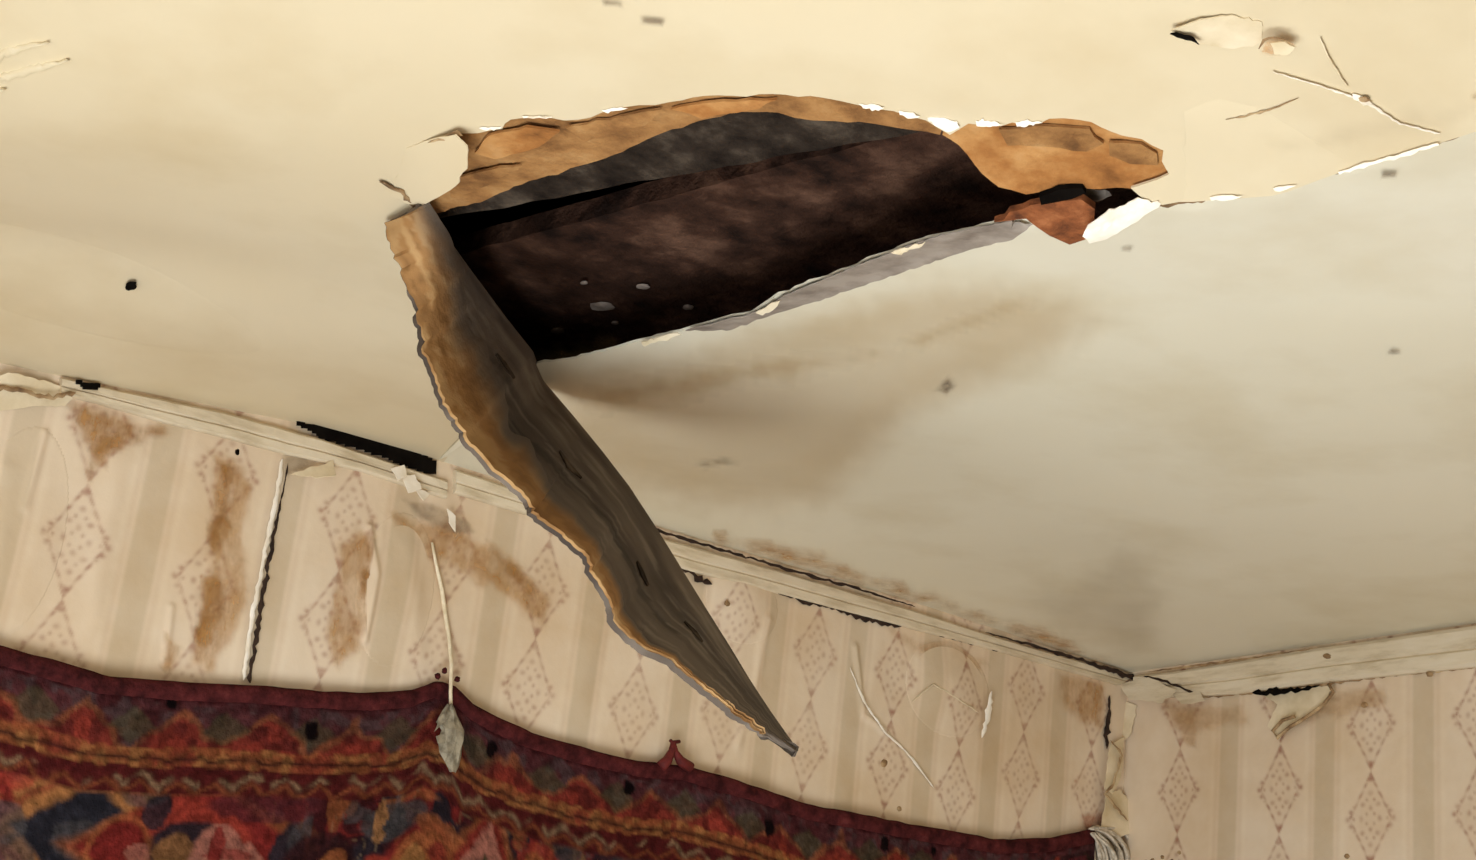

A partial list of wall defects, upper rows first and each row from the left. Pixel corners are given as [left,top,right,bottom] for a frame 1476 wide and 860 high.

peeling [1170,14,1295,55]
crack [1274,38,1456,174]
spalling [429,94,1168,347]
crack [1160,185,1297,208]
crack [76,380,101,390]
leakage [78,408,131,461]
crack [296,421,437,474]
peeling [391,465,429,501]
peeling [447,509,456,532]
crack [242,459,288,683]
leakage [196,579,241,646]